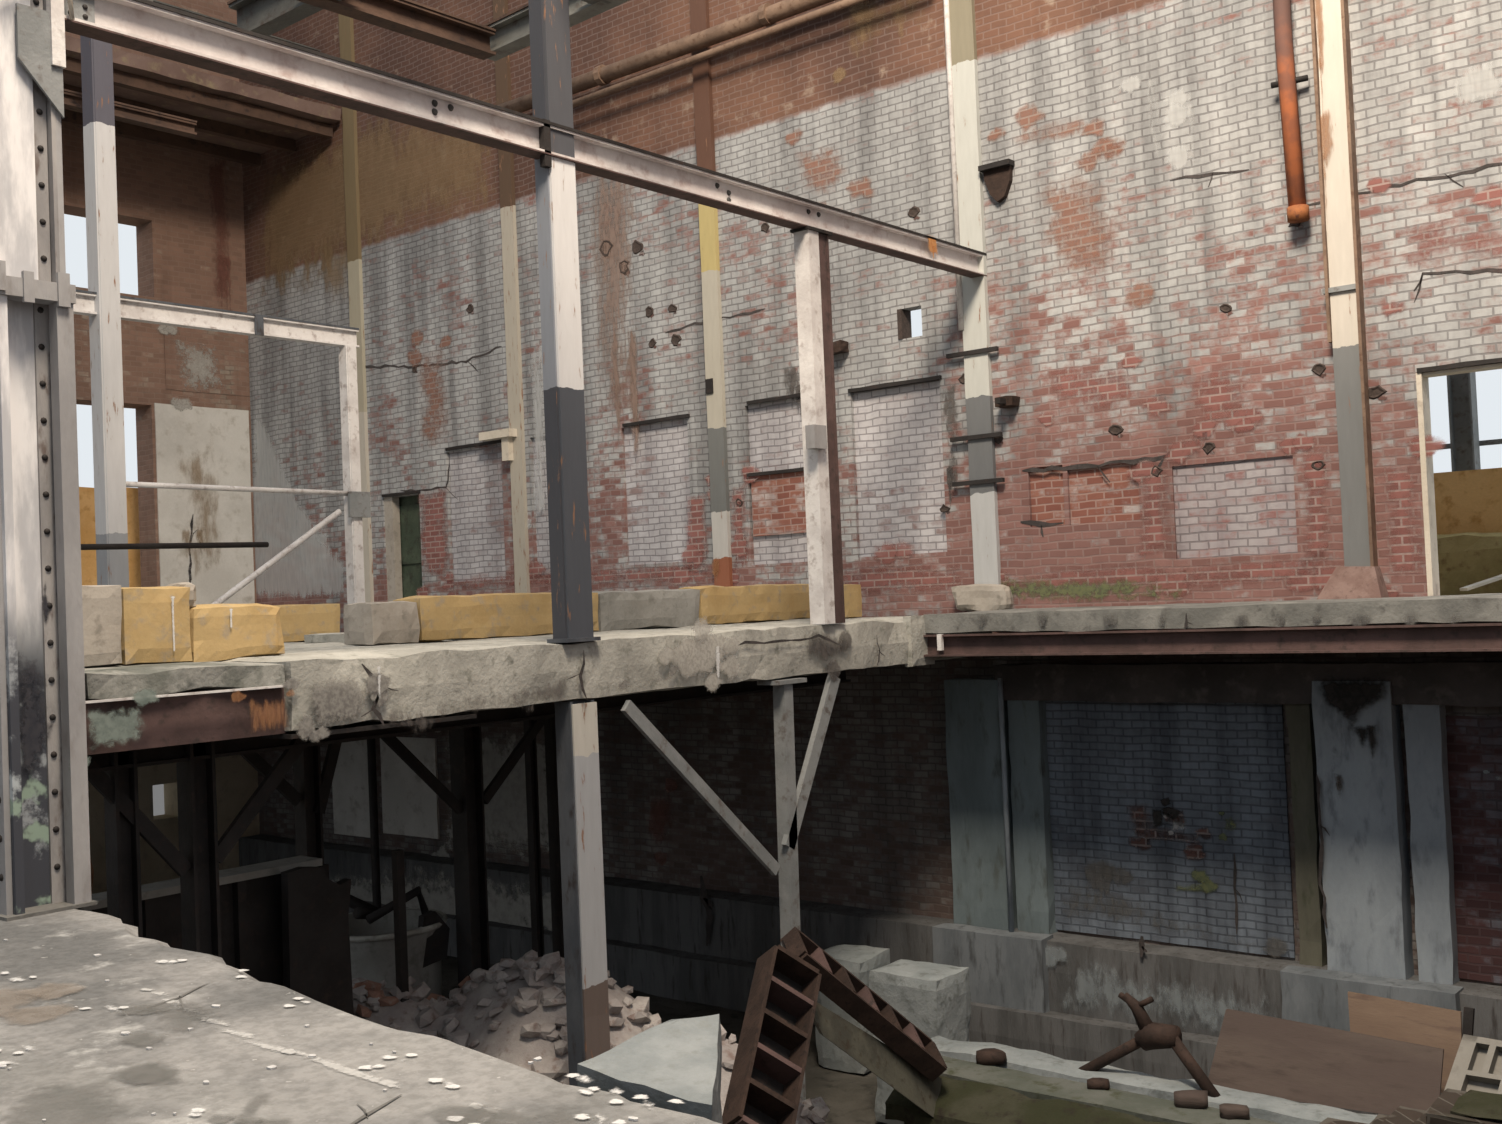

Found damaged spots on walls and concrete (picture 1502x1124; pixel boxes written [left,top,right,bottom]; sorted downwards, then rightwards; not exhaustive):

crack [1358,162,1502,194]
peeling [1048,121,1125,269]
spalling [908,206,920,220]
spalling [599,240,644,276]
crack [1413,268,1502,302]
spalling [645,304,677,318]
spalling [648,334,682,348]
crack [365,346,502,370]
spalling [1311,363,1326,378]
peeling [1410,435,1445,458]
corrosion [232,690,294,729]
crack [350,1094,402,1124]